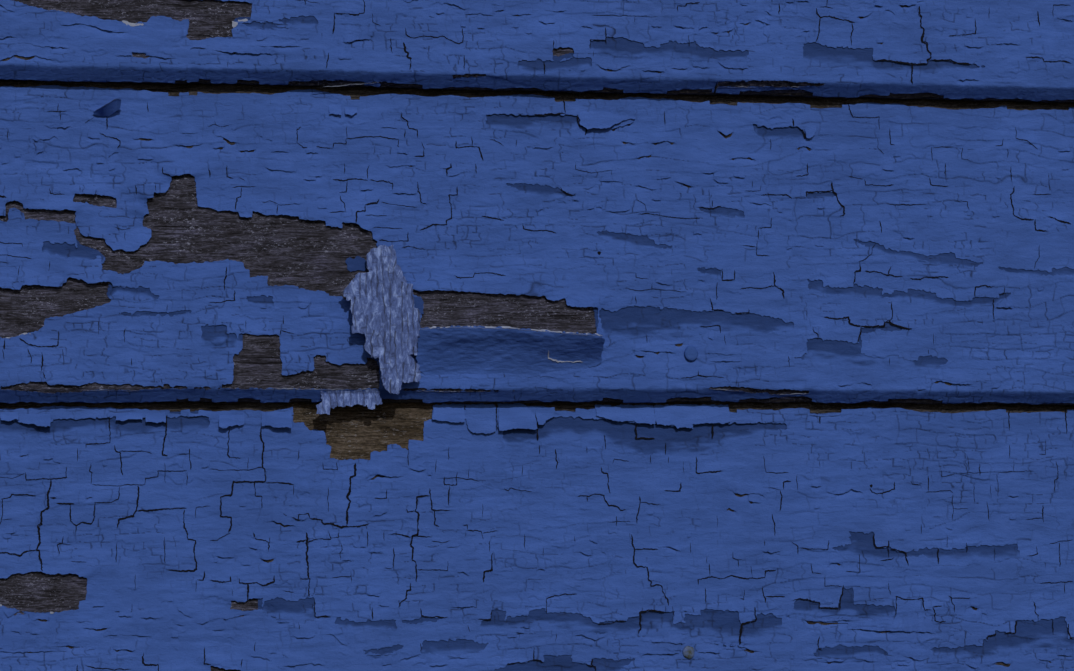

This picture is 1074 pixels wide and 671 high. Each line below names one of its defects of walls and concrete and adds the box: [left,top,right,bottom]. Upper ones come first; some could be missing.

peeling [12,0,318,40]
crack [816,0,855,44]
crack [876,6,990,84]
crack [296,112,517,250]
crack [701,119,970,354]
crack [997,127,1071,269]
peeling [0,174,809,460]
peeling [0,571,87,615]
crack [76,653,159,671]
crack [0,416,494,631]
crack [578,423,721,634]
crack [690,409,1074,644]